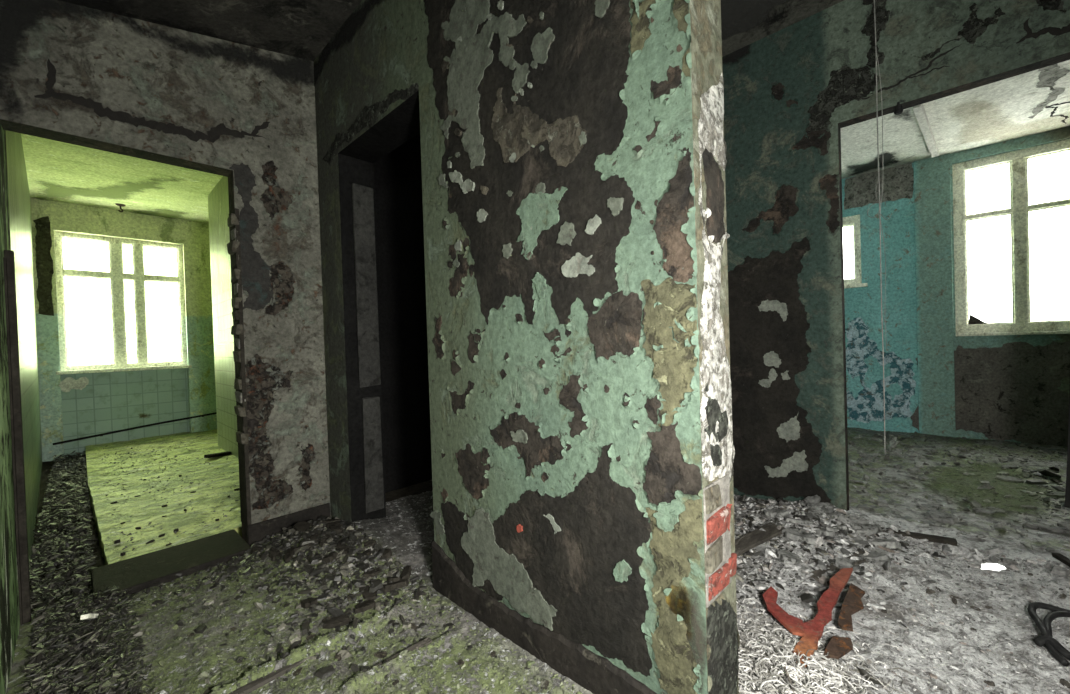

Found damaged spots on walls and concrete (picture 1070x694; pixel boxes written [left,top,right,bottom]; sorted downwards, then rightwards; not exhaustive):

crack [34,59,270,143]
peeling [789,0,890,156]
crack [1016,19,1070,44]
peeling [227,160,317,528]
peeling [424,0,833,694]
peeling [845,316,919,433]
peeling [954,341,1070,447]